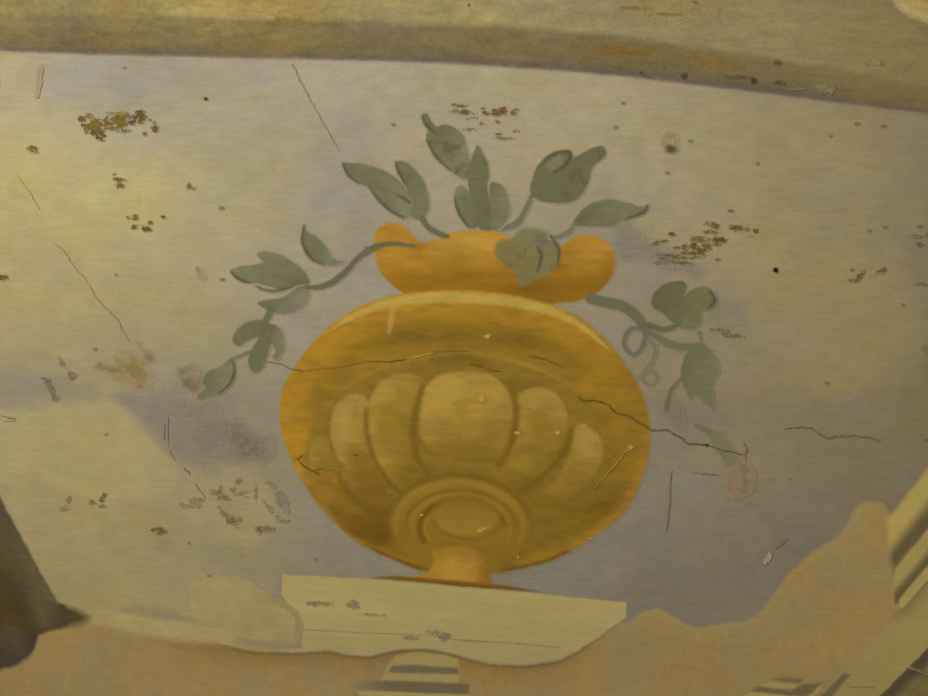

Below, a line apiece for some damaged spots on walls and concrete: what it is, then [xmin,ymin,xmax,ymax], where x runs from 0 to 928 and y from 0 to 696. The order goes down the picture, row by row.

peeling [890,0,928,26]
peeling [77,109,159,142]
peeling [448,103,520,140]
peeling [651,220,758,265]
crack [266,350,501,372]
crack [578,396,747,461]
crack [784,426,880,442]
peeling [88,492,107,508]
peeling [178,478,290,535]
flaking render [0,500,899,696]